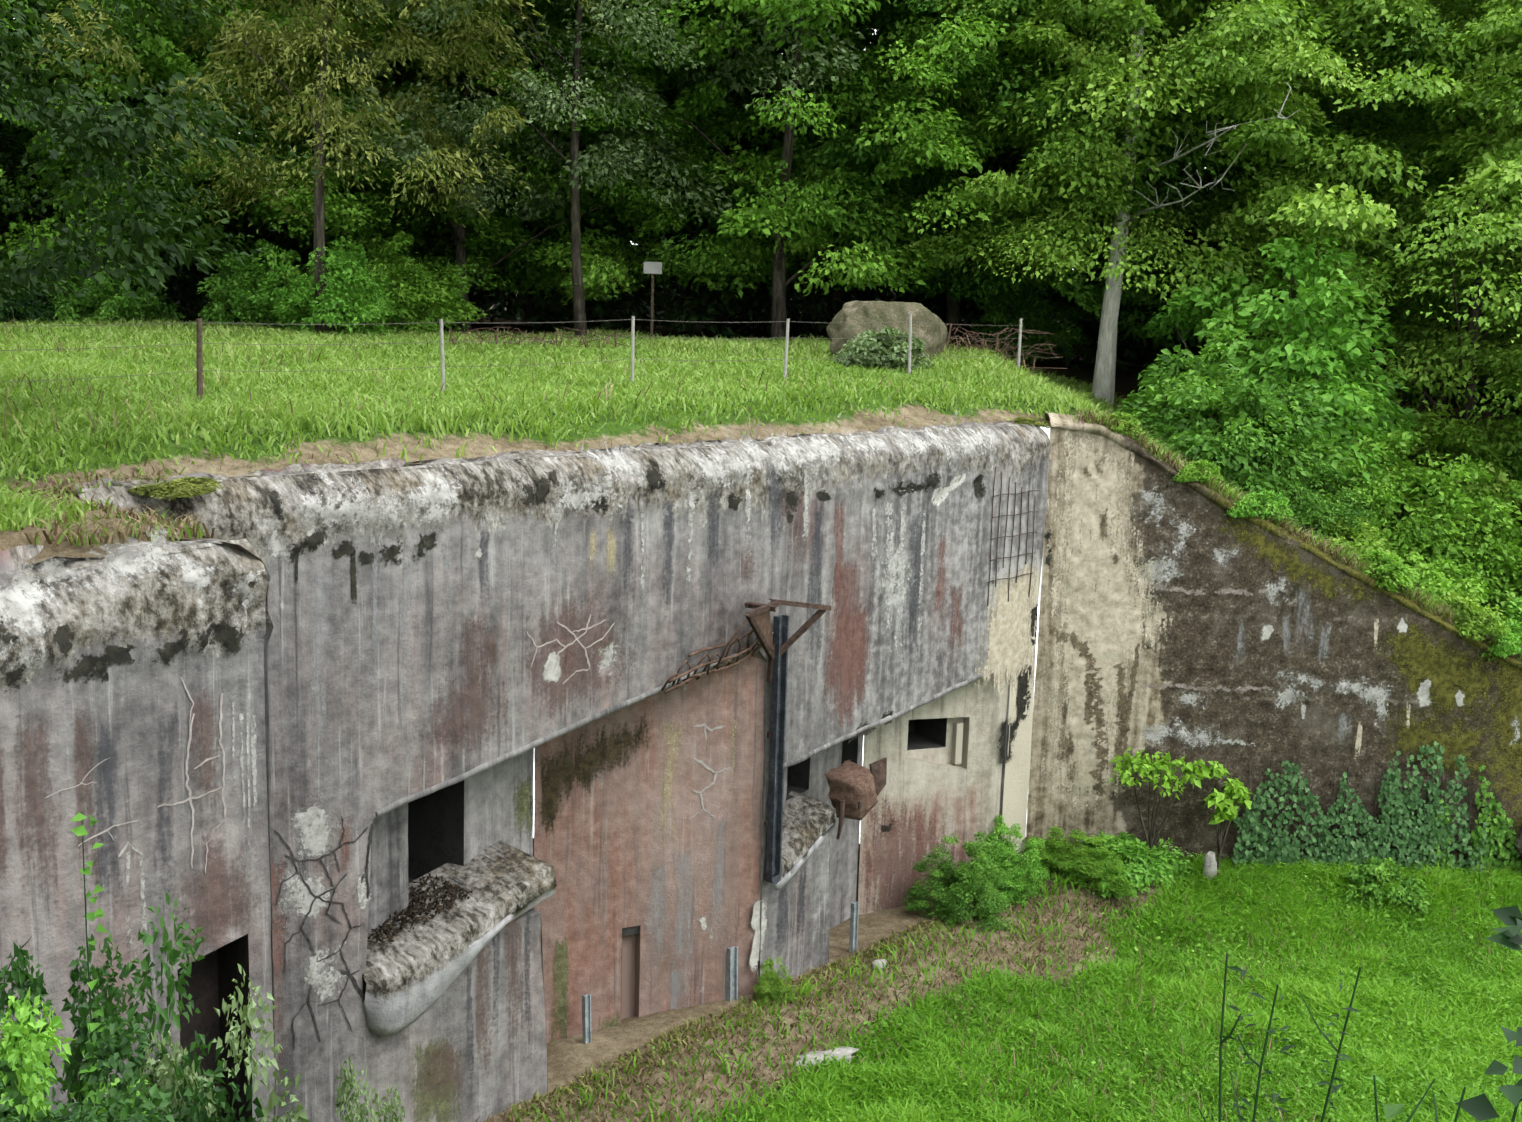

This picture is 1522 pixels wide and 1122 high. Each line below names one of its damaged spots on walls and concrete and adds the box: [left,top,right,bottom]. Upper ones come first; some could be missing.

leakage [350,548,378,650]
crack [527,614,615,684]
leakage [663,492,719,604]
leakage [802,462,823,663]
rust [824,503,869,727]
leakage [871,501,926,660]
spalling [1261,625,1274,641]
spalling [1397,617,1408,633]
spalling [1416,678,1432,707]
spalling [1455,690,1465,706]
leakage [232,702,257,827]
crack [274,816,374,1051]